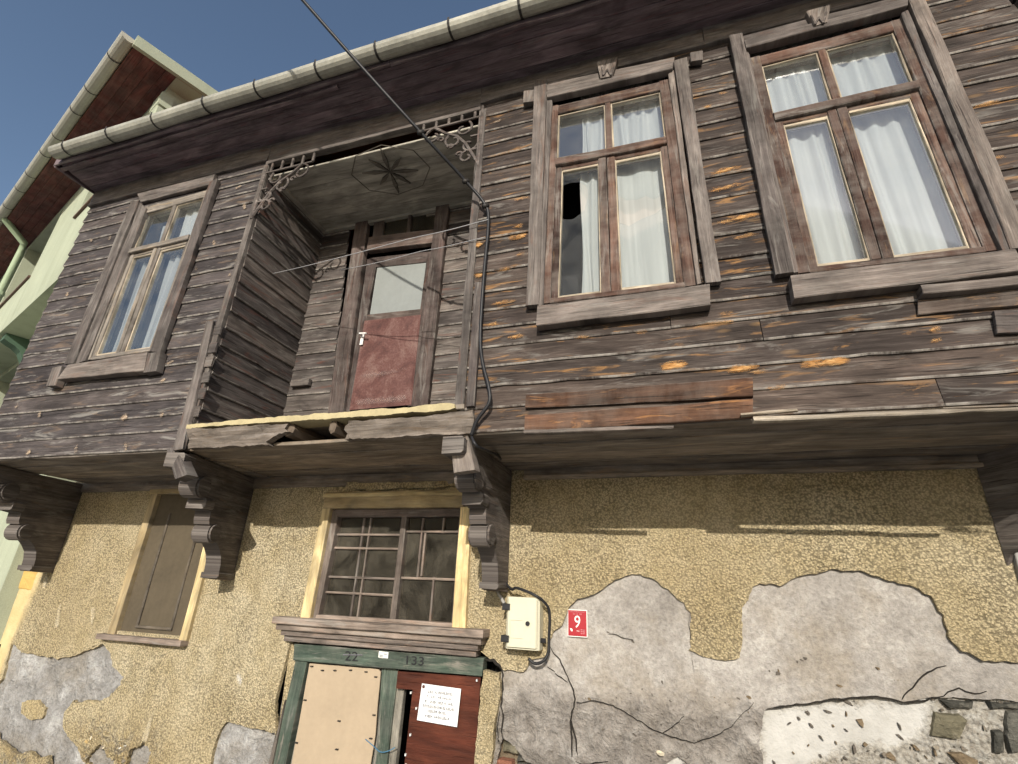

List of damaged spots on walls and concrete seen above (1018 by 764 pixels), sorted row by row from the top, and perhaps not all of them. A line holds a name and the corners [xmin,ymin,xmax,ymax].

peeling [661,360,686,369]
peeling [803,357,847,366]
flaking render [0,645,151,764]
flaking render [213,704,282,764]
flaking render [493,569,1018,764]
crack [548,647,987,764]